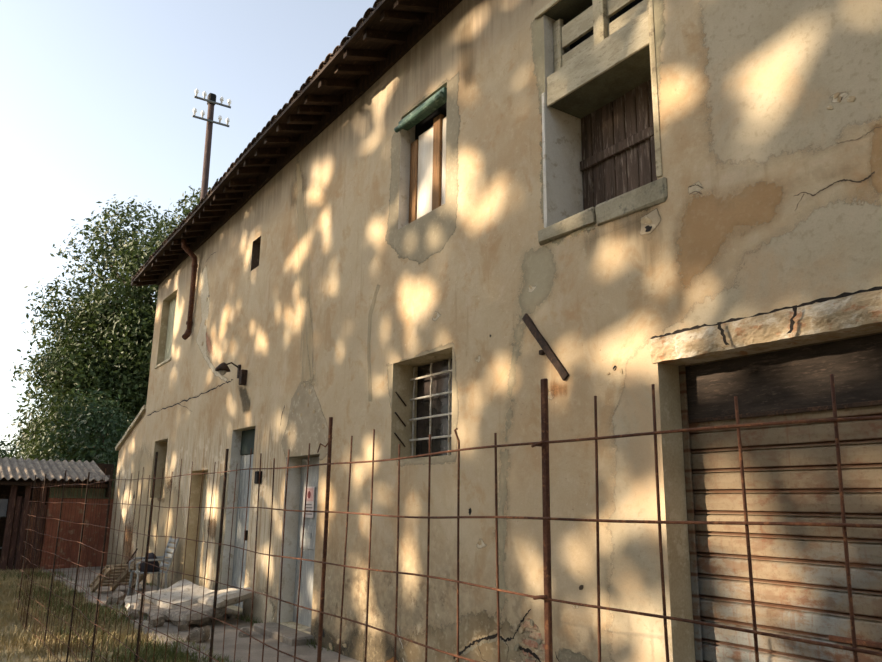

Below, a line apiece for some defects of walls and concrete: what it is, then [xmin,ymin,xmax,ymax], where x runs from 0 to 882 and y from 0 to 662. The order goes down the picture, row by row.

crack [794,171,875,210]
crack [368,286,379,401]
peeling [605,0,882,662]
crack [650,286,882,345]
crack [147,379,233,416]
peeling [386,246,556,662]
crack [453,609,559,662]